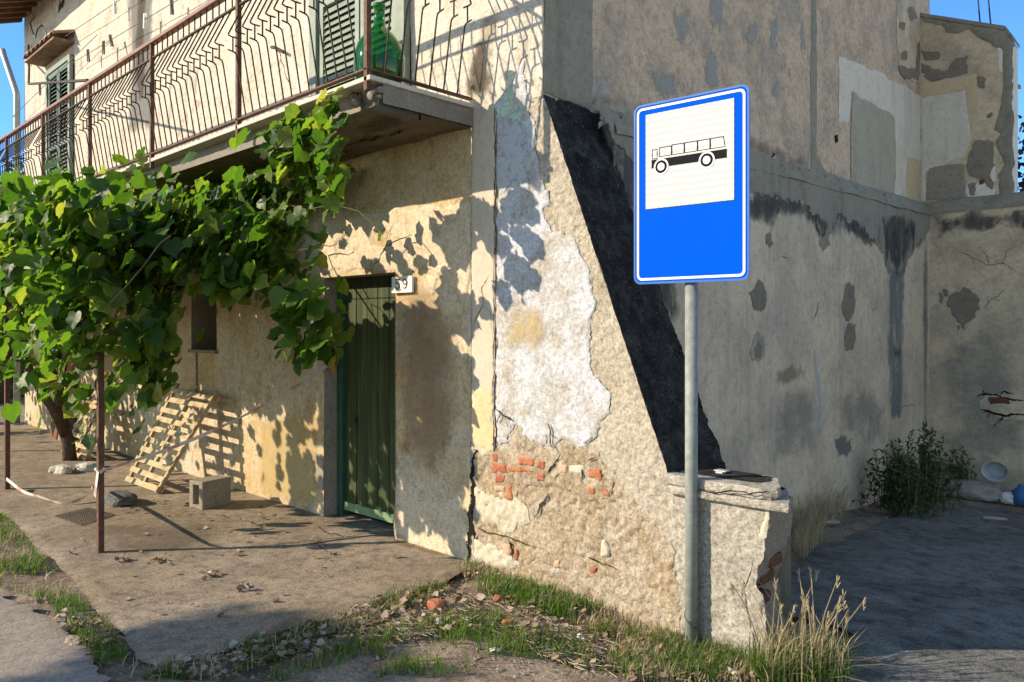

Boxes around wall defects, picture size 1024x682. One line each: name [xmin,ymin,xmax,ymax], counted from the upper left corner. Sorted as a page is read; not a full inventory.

peeling [897,0,986,89]
peeling [965,139,996,197]
damp [938,211,1024,232]
crack [466,108,594,561]
peeling [473,60,680,634]
spalling [749,279,767,311]
damp [750,192,928,418]
spalling [842,282,856,351]
spalling [939,287,980,330]
flaking render [979,391,1024,421]
flaking render [758,551,782,603]